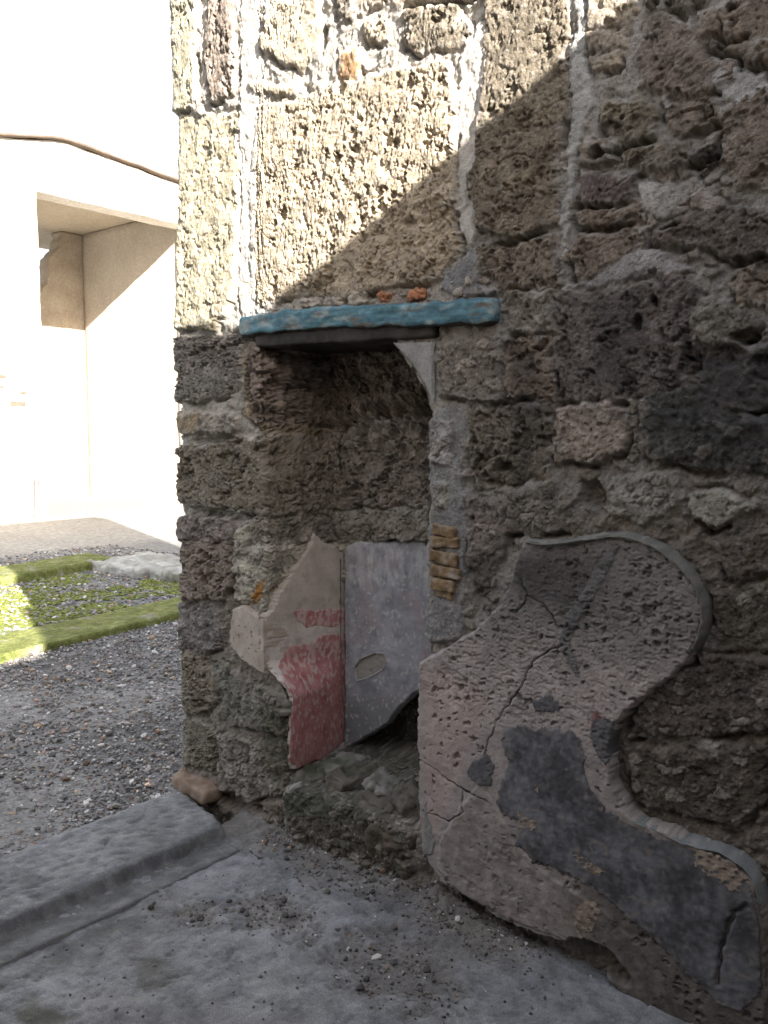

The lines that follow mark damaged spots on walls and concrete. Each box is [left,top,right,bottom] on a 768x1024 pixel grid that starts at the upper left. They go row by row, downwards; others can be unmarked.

peeling [278,606,387,769]
crack [421,760,481,822]
peeling [694,850,748,892]
peeling [573,901,601,939]
spalling [597,944,631,980]